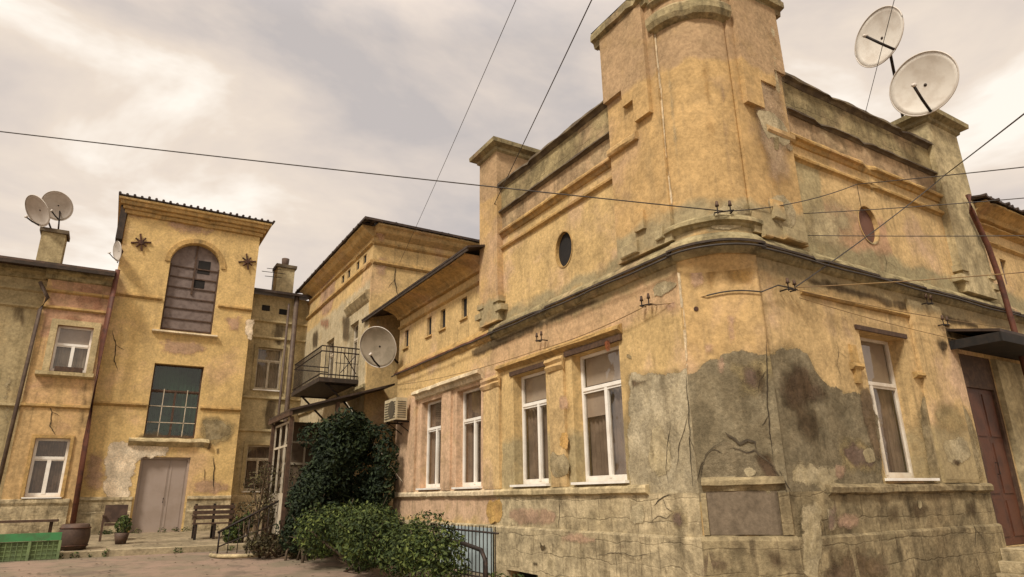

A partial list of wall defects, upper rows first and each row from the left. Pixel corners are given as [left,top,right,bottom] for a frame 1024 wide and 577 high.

flaking render [227,317,254,340]
flaking render [200,417,233,449]
crack [653,382,704,520]
flaking render [627,272,886,577]